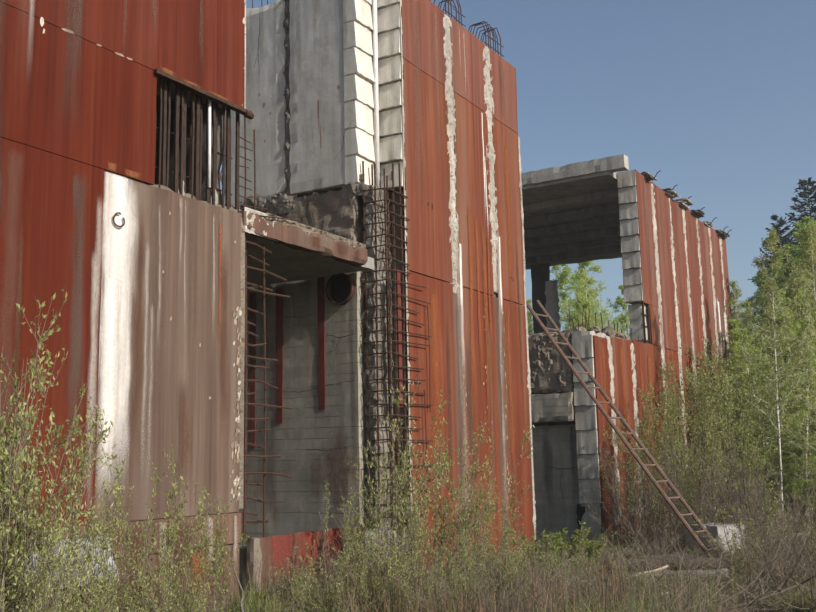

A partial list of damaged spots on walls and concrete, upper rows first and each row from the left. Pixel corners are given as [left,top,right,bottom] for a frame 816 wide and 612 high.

damp [89,172,135,460]
rust [131,237,144,395]
damp [143,249,153,395]
rust [219,228,227,388]
spalling [229,0,366,542]
rust [430,294,452,450]
rust [467,213,492,464]